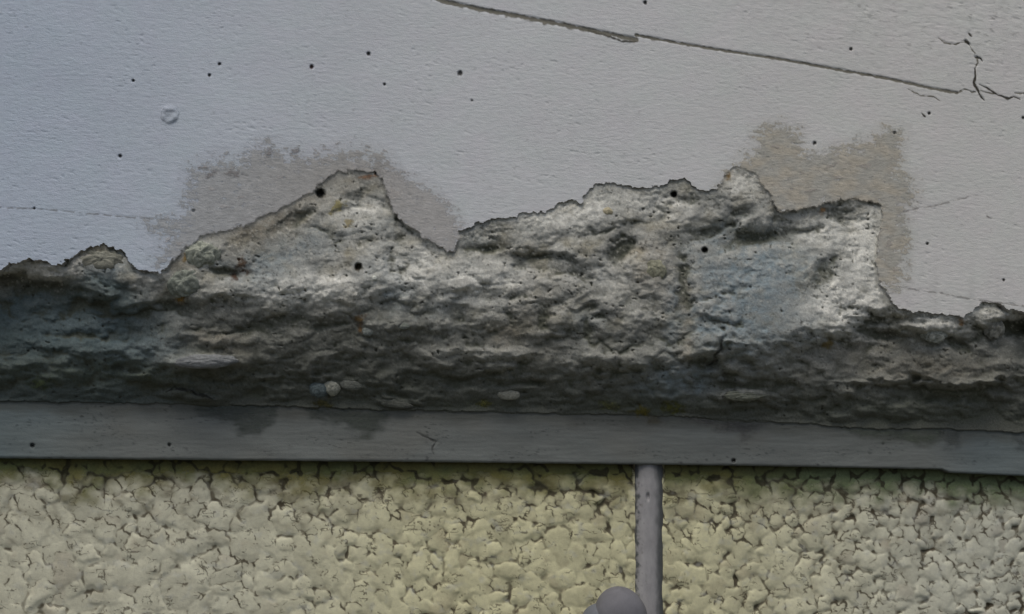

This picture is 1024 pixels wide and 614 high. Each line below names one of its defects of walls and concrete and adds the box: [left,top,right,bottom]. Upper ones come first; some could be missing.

crack [436,0,1024,117]
spalling [0,122,1024,434]